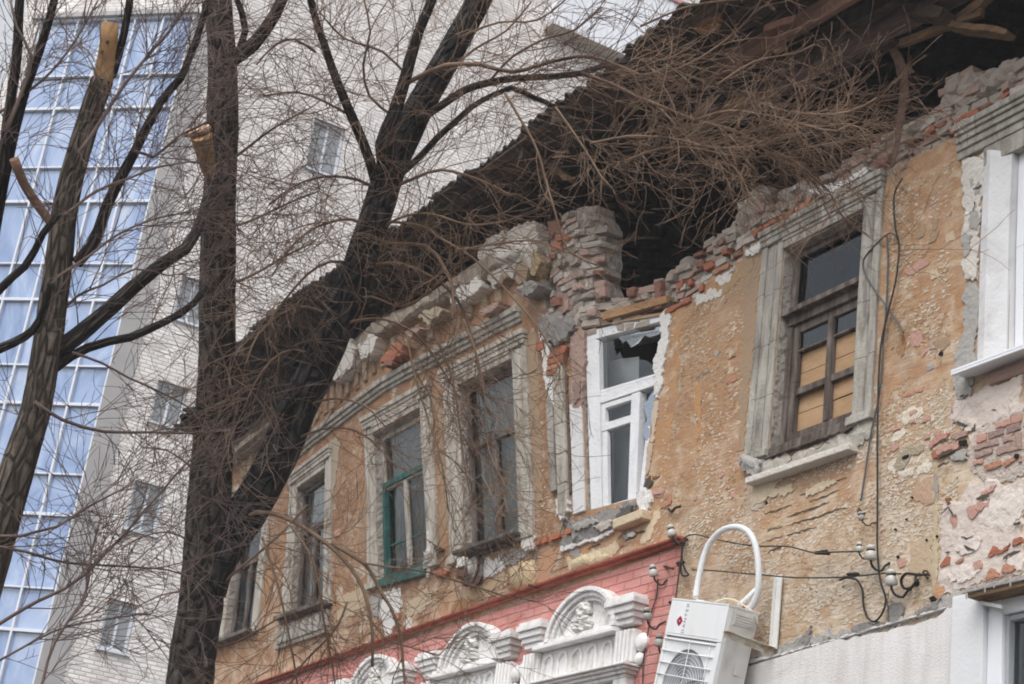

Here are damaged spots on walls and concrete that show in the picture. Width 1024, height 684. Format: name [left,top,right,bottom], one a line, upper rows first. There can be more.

flaking render [333,326,428,385]
flaking render [450,57,1024,599]